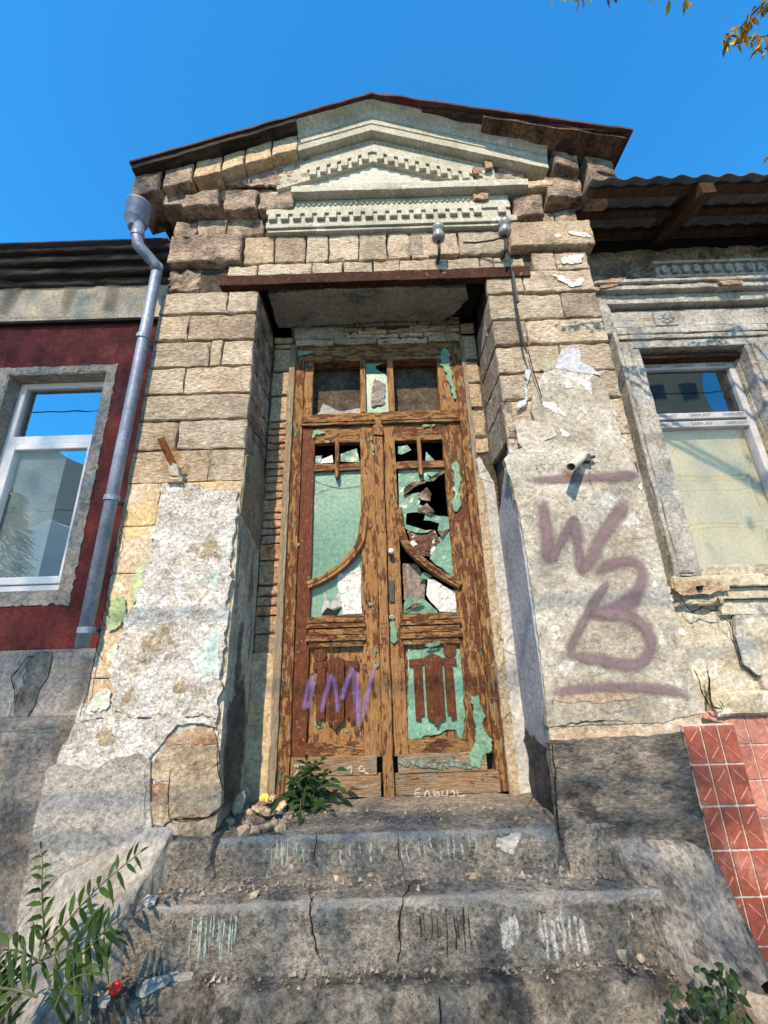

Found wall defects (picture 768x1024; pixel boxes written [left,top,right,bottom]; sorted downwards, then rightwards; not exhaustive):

flaking render [57,482,239,837]
flaking render [502,346,730,740]
crack [309,832,321,960]
crack [397,834,422,962]